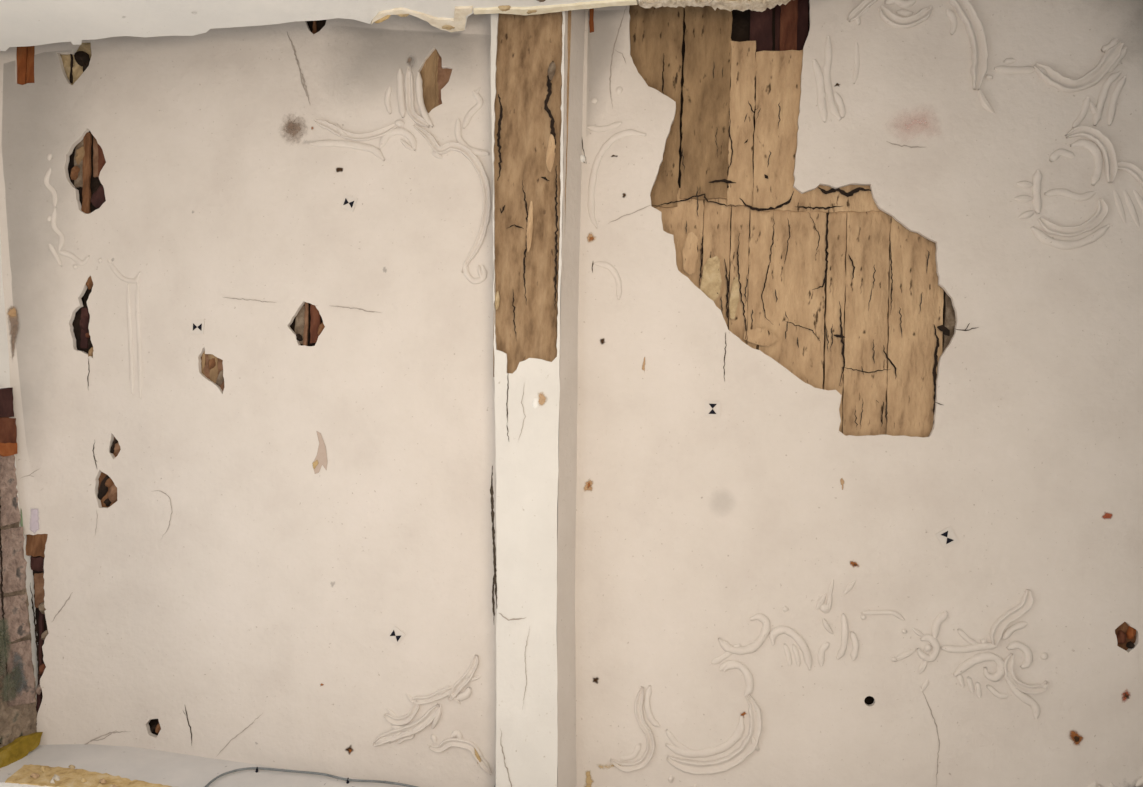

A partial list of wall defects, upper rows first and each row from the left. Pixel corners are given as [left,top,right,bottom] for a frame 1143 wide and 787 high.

spalling [60,43,92,85]
spalling [68,131,106,214]
spalling [371,0,956,437]
spalling [72,276,94,357]
spalling [290,302,325,346]
spalling [201,350,224,391]
spalling [97,472,117,507]
spalling [0,455,49,748]
crack [490,466,530,709]
spalling [1115,622,1136,651]